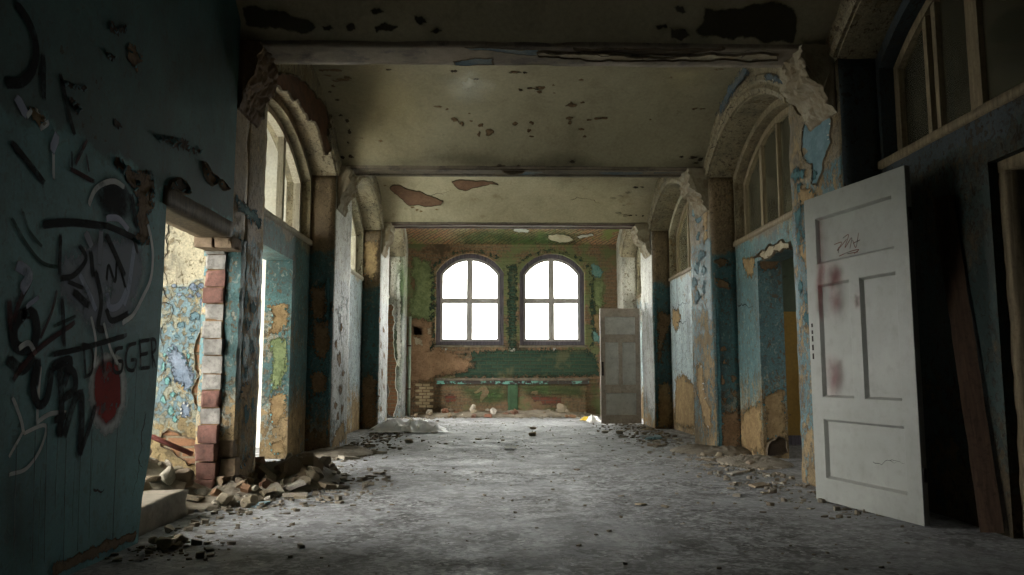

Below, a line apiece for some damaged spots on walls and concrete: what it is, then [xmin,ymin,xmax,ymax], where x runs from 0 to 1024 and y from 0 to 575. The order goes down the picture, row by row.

flaking render [276,69,363,159]
peeling [434,106,494,137]
peeling [451,47,783,117]
spalling [114,155,192,248]
spalling [384,184,443,212]
spalling [452,164,543,191]
peeling [742,105,833,327]
peeling [160,283,204,466]
spalling [239,290,290,477]
spalling [360,233,604,429]
spalling [645,210,791,456]